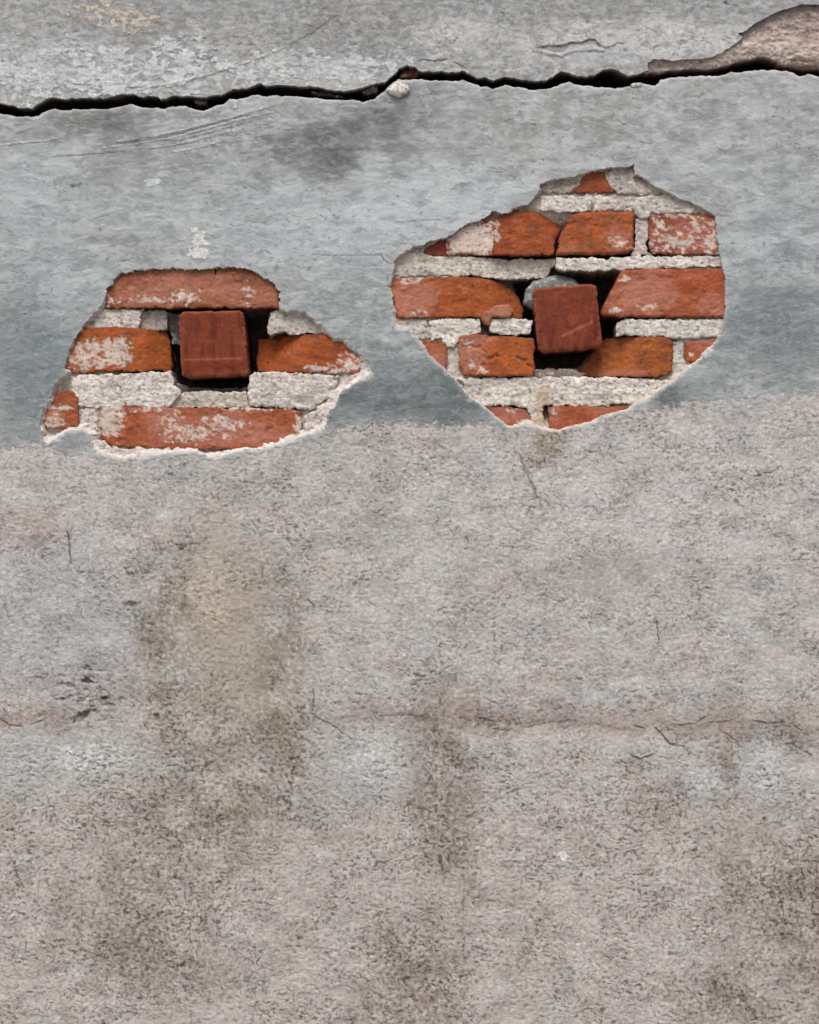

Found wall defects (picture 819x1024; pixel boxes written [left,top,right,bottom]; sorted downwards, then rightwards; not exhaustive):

crack [0,61,819,117]
spalling [641,5,819,80]
spalling [40,227,373,459]
spalling [388,164,726,433]